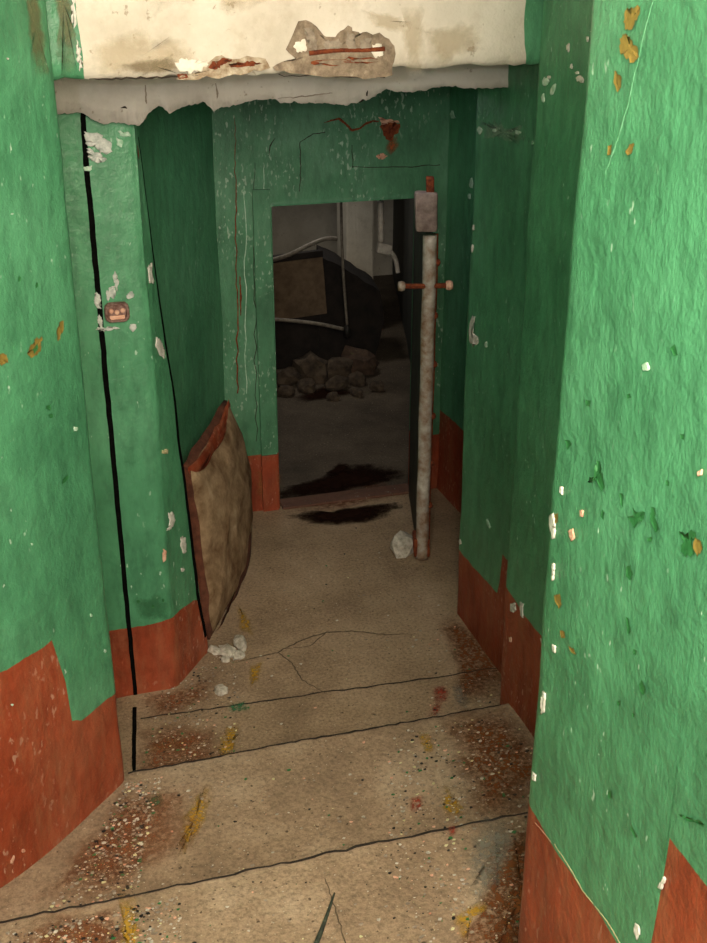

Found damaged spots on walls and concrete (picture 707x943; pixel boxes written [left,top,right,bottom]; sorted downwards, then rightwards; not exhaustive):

spalling [174,20,396,80]
peeling [619,5,640,63]
peeling [541,75,556,103]
rust [376,117,400,160]
spalling [94,272,137,332]
peeling [27,337,43,358]
spalling [155,337,165,358]
crack [80,74,501,774]
spalling [549,513,558,540]
peeling [619,493,659,542]
peeling [679,529,702,557]
peeling [510,601,524,618]